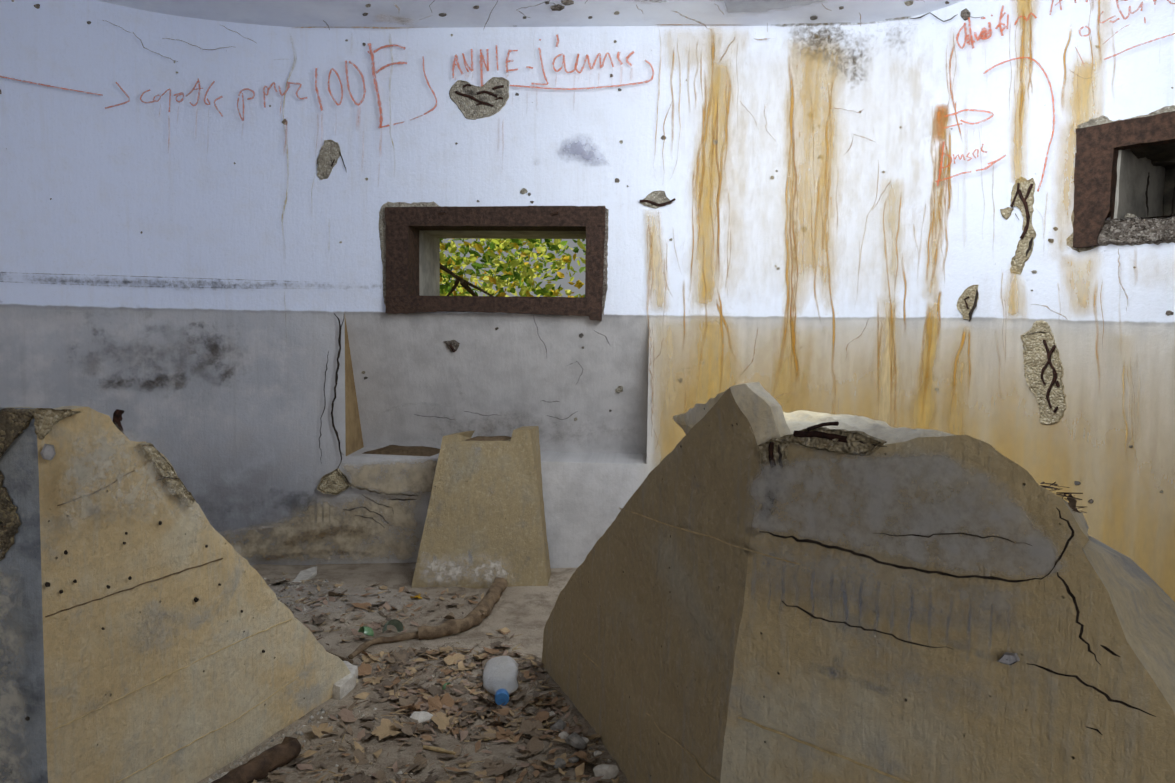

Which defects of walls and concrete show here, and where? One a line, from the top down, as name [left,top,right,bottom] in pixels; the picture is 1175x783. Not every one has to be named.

spalling [317,140,346,180]
spalling [449,77,519,120]
corrosion [691,45,734,404]
corrosion [775,48,838,405]
water stain [777,22,875,75]
corrosion [927,37,961,268]
corrosion [1062,0,1100,207]
spalling [1000,176,1175,274]
crack [319,313,418,528]
corrosion [914,290,940,429]
spalling [957,285,979,321]
spalling [1020,320,1067,425]